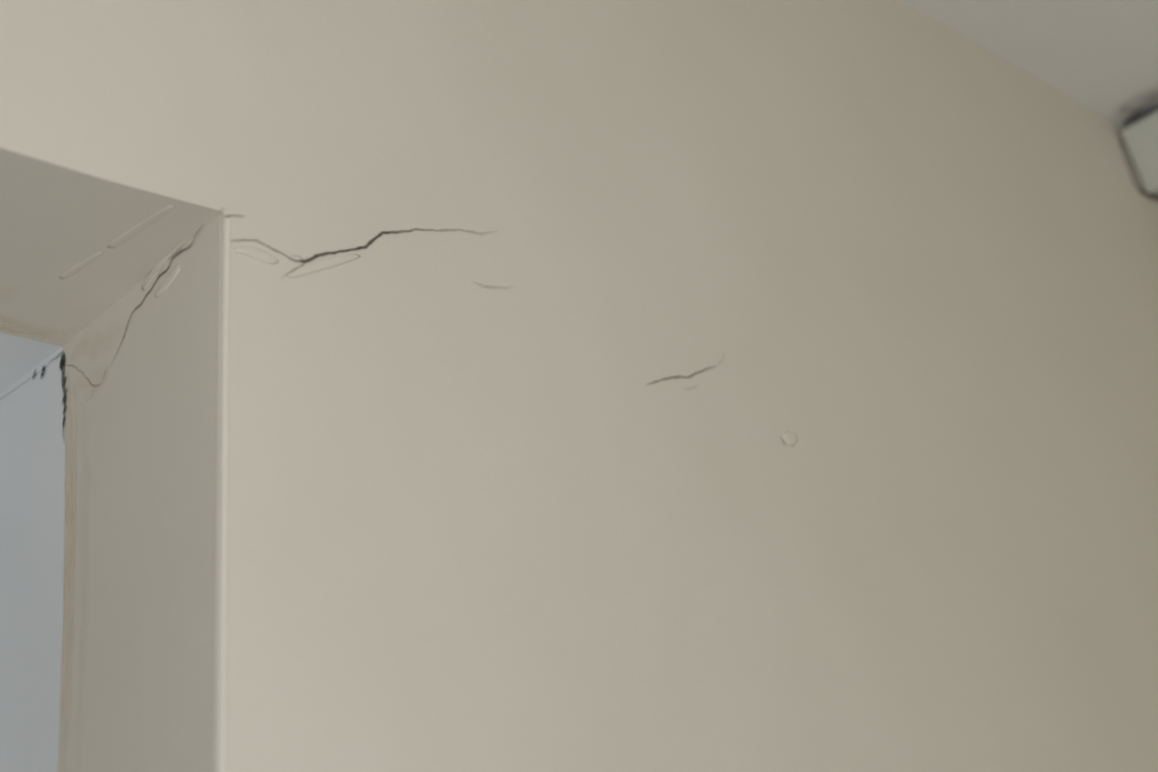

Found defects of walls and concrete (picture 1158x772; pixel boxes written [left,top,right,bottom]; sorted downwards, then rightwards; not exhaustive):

crack [234,231,398,278]